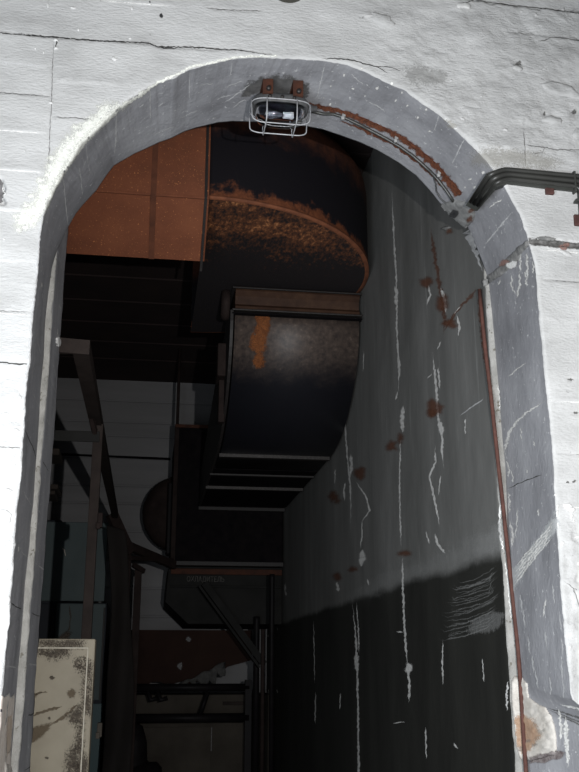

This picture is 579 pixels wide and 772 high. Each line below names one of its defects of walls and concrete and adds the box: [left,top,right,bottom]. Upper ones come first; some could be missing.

crack [463,0,579,14]
crack [541,35,579,43]
rust [309,102,463,197]
efflorescence [5,55,277,616]
rust [249,316,271,367]
flaking render [0,693,15,772]
spalling [511,676,570,766]